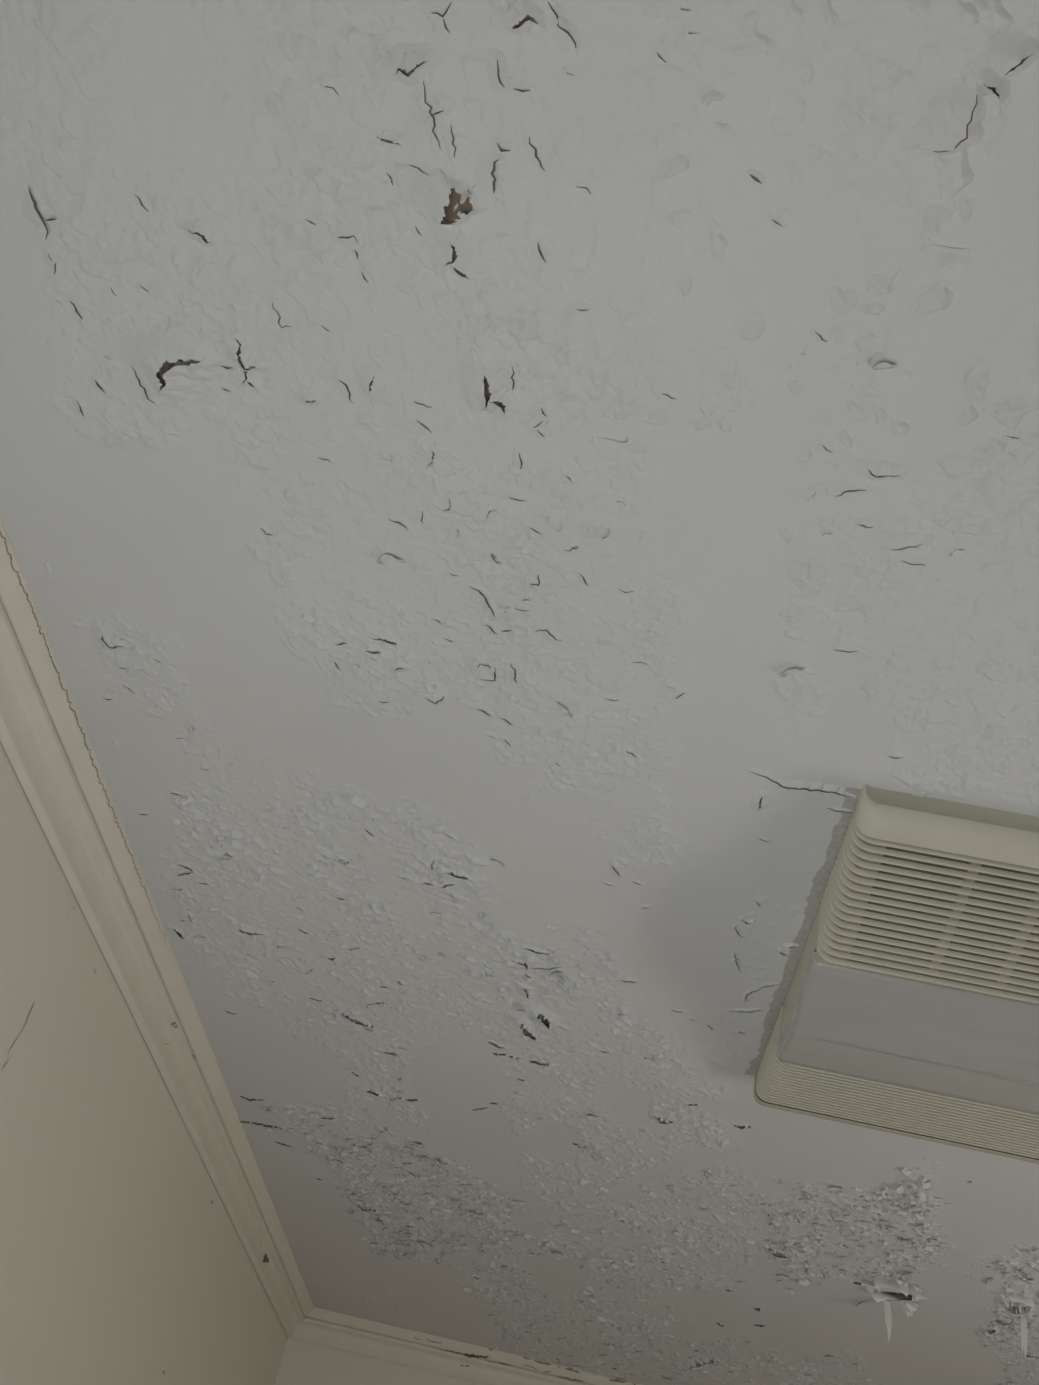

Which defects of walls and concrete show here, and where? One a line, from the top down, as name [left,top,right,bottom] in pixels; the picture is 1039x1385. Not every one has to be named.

peeling [490,0,559,40]
peeling [381,42,445,86]
peeling [966,21,1039,122]
peeling [175,219,224,247]
peeling [410,167,503,282]
peeling [135,324,271,408]
peeling [359,362,385,406]
peeling [461,353,520,425]
peeling [417,436,512,526]
peeling [485,944,563,1067]
peeling [847,1276,928,1343]
peeling [988,1276,1038,1359]